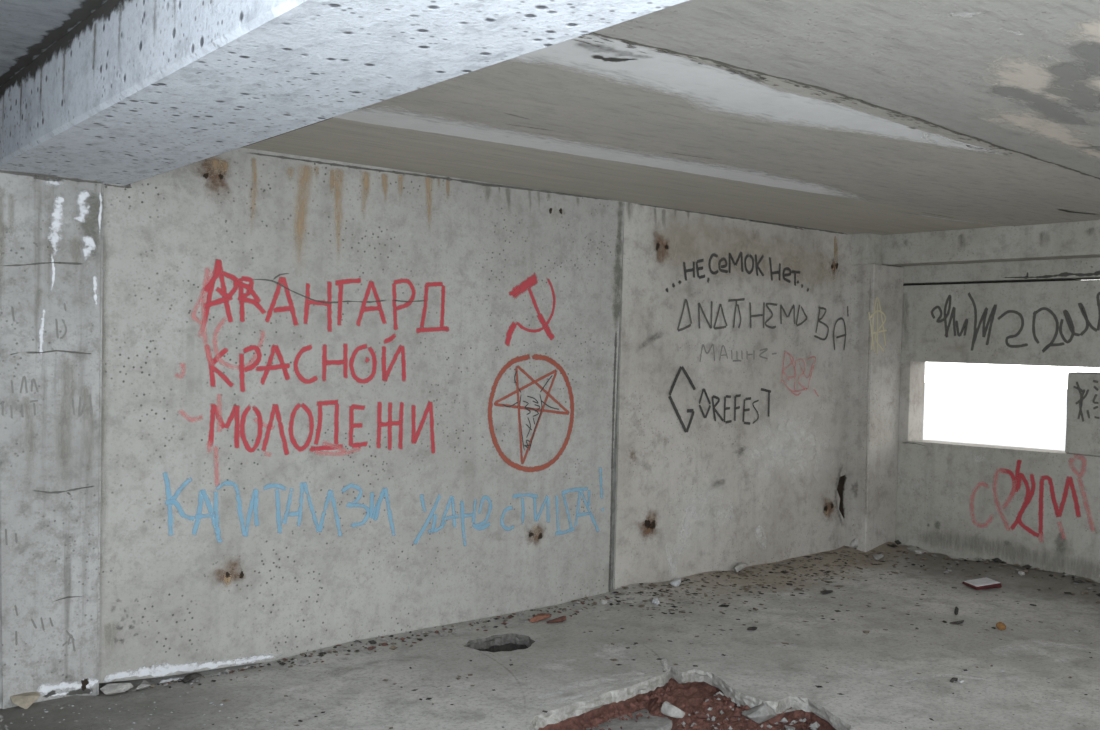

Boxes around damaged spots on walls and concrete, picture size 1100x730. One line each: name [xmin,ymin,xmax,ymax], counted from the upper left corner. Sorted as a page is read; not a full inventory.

peeling [1074,20,1100,44]
spalling [575,32,1100,179]
rust [199,159,227,190]
spalling [835,475,854,518]
leakage [38,655,274,697]
spalling [538,678,836,730]